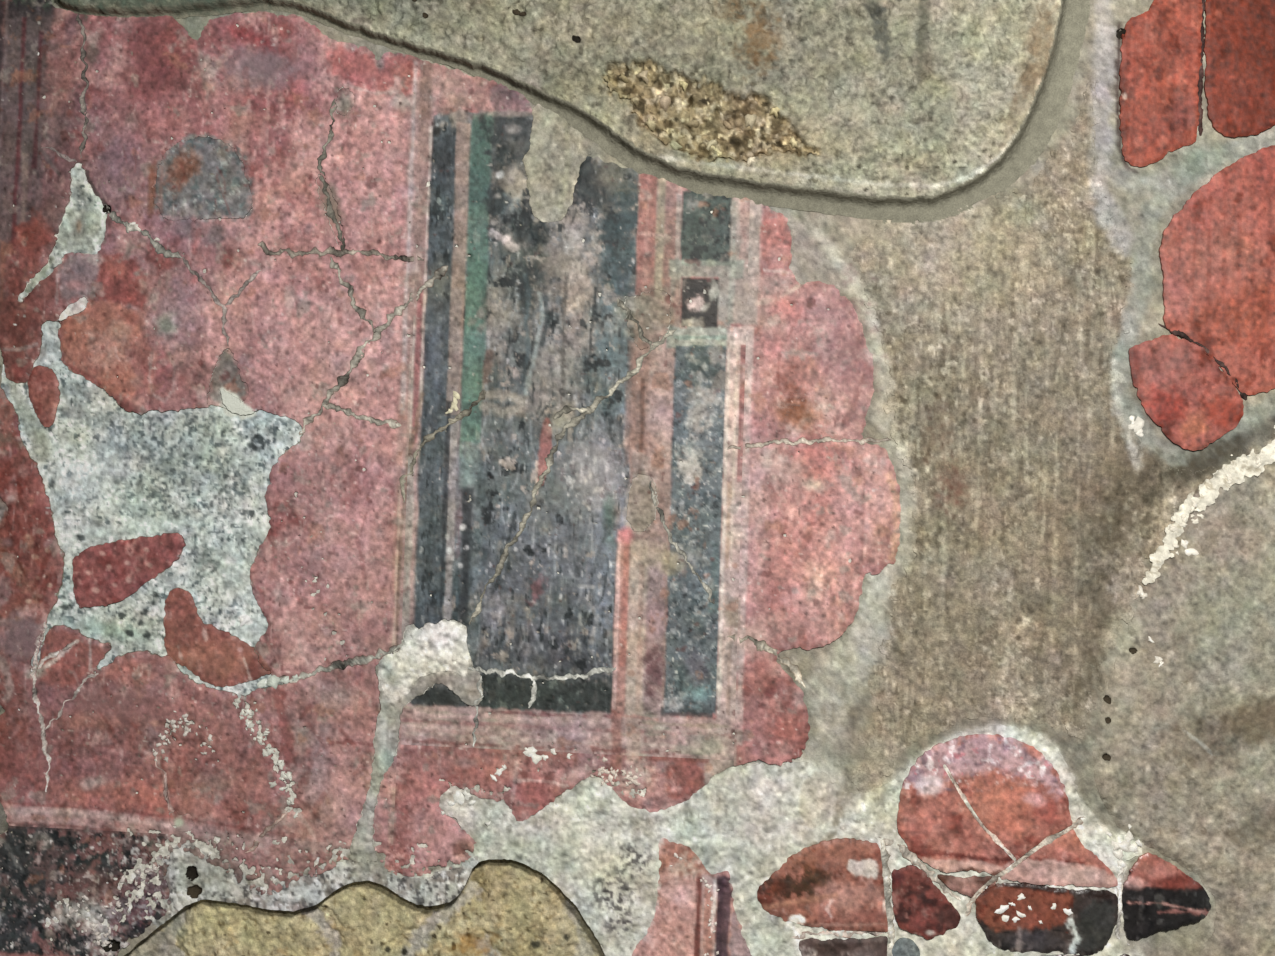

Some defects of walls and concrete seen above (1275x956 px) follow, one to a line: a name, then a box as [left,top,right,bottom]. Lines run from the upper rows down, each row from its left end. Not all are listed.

flaking render [18,163,108,301]
peeling [151,137,253,221]
crack [104,99,486,502]
spalling [604,60,818,167]
flaking render [0,297,302,819]
crack [469,298,676,625]
leakage [1142,425,1275,585]
crack [30,622,98,792]
crack [468,666,616,747]
peeling [523,746,572,764]
crack [791,766,1085,956]
peeling [994,893,1043,924]